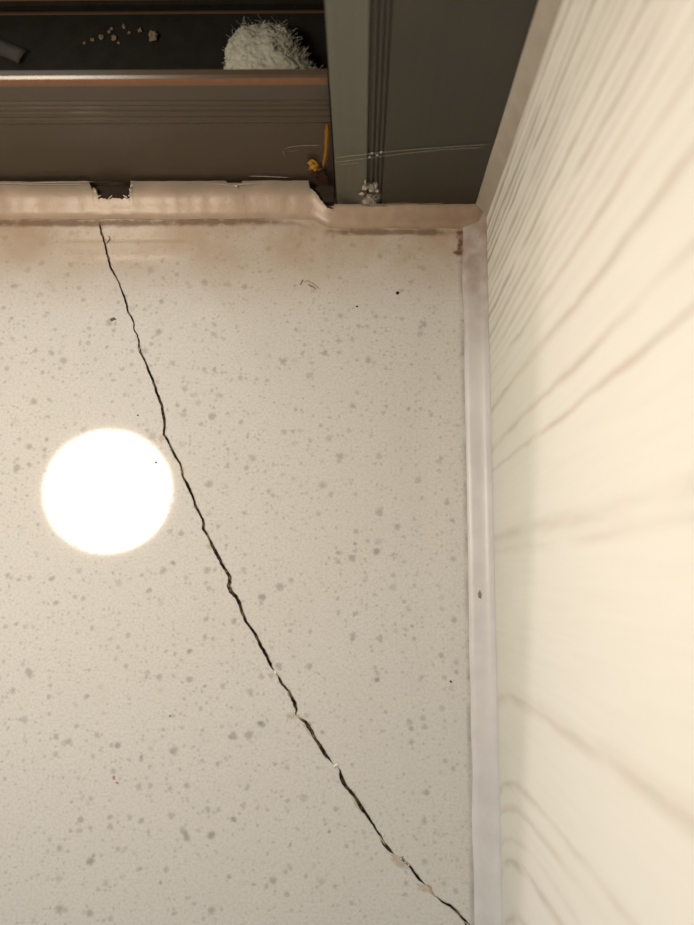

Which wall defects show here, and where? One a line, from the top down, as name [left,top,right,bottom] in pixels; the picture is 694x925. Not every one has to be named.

crack [99,221,470,925]